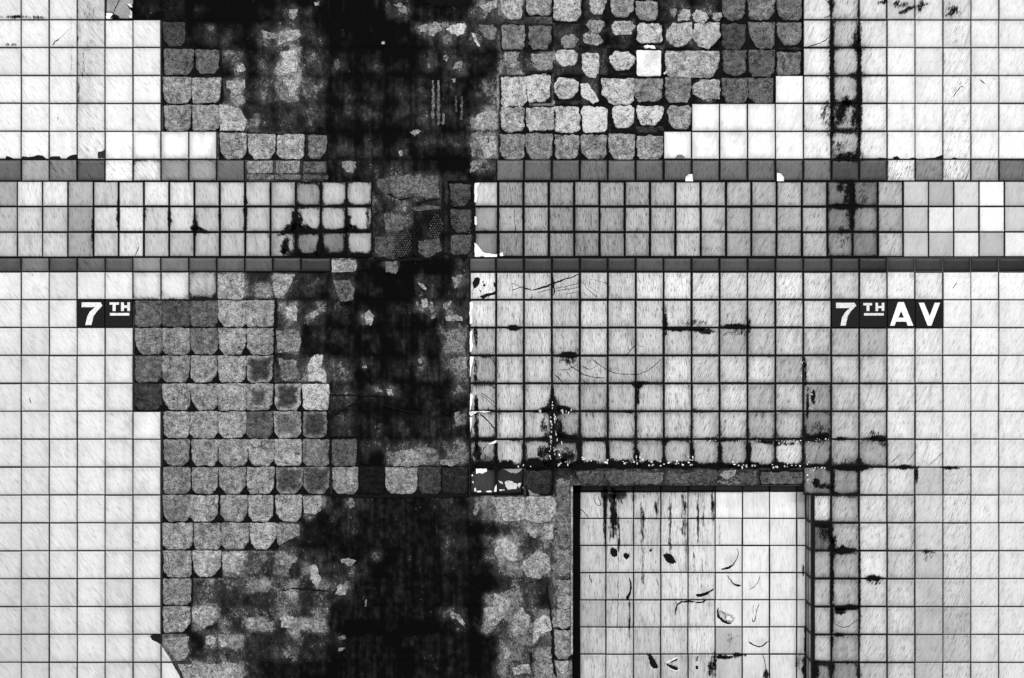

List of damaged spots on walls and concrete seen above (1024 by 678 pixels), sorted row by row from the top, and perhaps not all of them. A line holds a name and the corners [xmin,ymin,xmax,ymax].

water stain [821,0,863,160]
water stain [132,0,803,583]
spalling [134,0,825,678]
crack [512,274,607,299]
water stain [811,465,873,496]
water stain [167,495,571,678]
water stain [817,524,862,648]